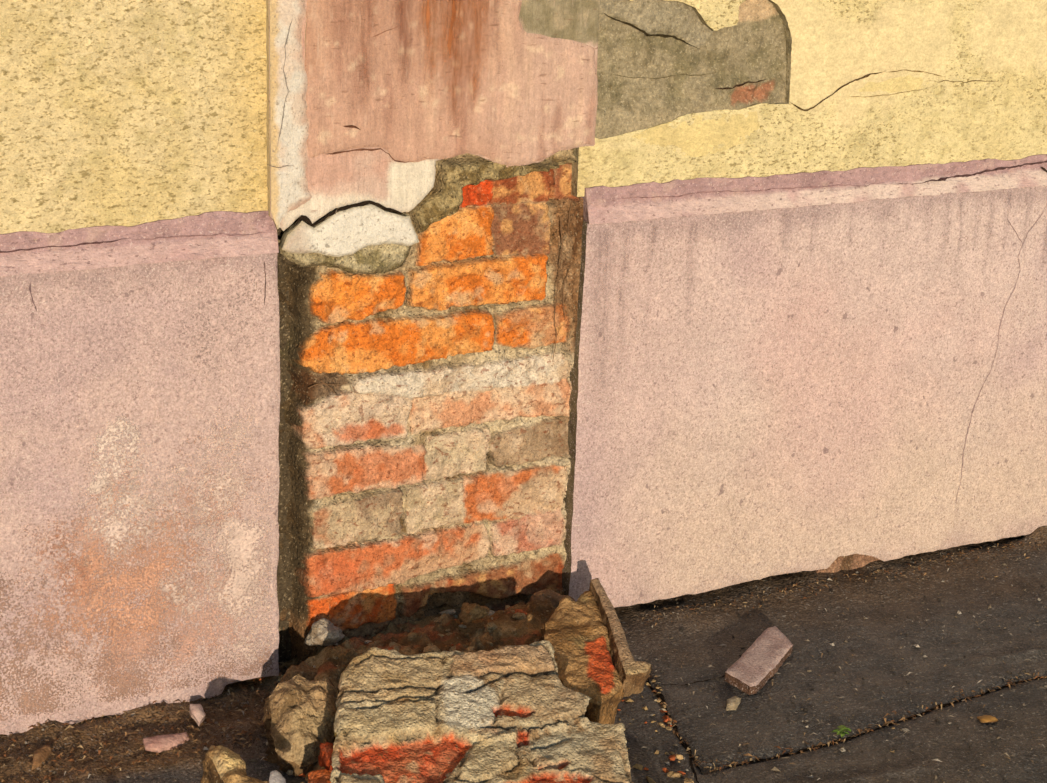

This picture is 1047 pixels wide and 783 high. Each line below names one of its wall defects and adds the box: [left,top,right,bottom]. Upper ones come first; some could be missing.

crack [0,201,403,253]
spalling [277,0,787,666]
crack [621,161,1047,199]
crack [792,70,1004,111]
crack [955,205,1047,516]
water stain [0,415,273,721]